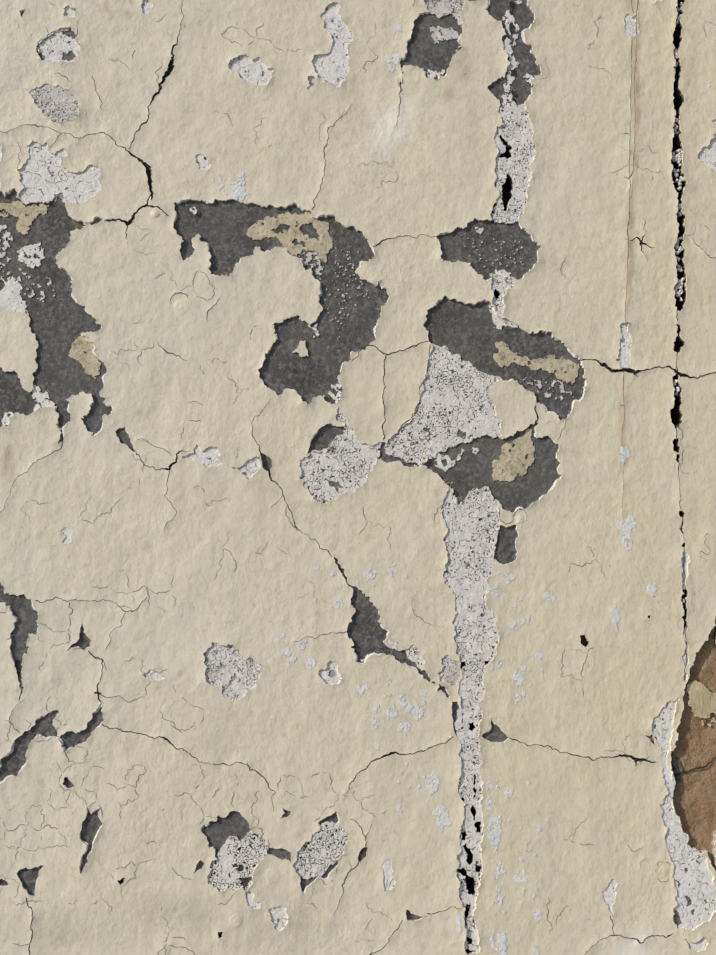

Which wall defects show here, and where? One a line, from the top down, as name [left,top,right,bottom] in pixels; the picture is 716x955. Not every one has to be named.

crack [0,4,185,255]
peeling [0,141,114,444]
crack [133,401,203,529]
crack [236,400,332,557]
peeling [173,0,587,953]
crack [579,350,716,441]
peeling [0,583,39,691]
peeling [67,625,90,651]
peeling [0,703,104,783]
crack [0,570,453,955]
crack [510,735,655,766]
spalling [642,618,716,952]